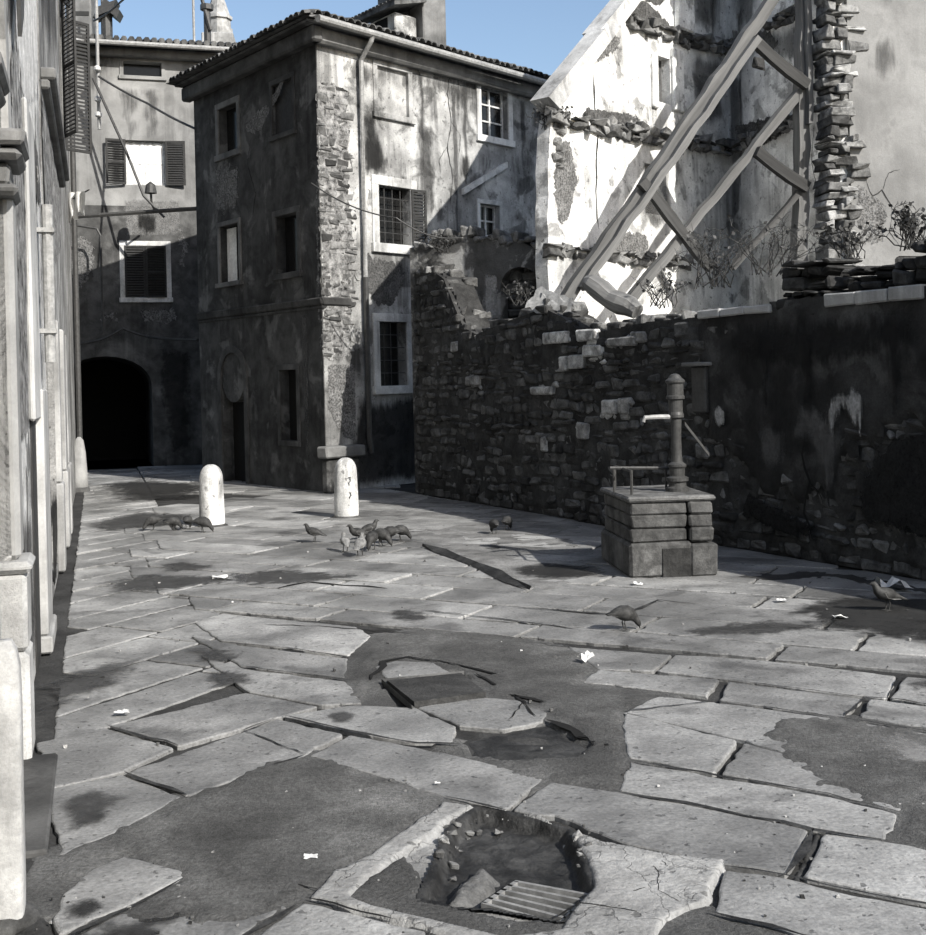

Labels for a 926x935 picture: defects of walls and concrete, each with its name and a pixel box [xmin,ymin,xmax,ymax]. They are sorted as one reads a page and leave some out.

flaking render [632,0,670,27]
flaking render [554,140,579,224]
spalling [315,82,404,368]
water stain [734,317,910,487]
crack [555,902,646,918]